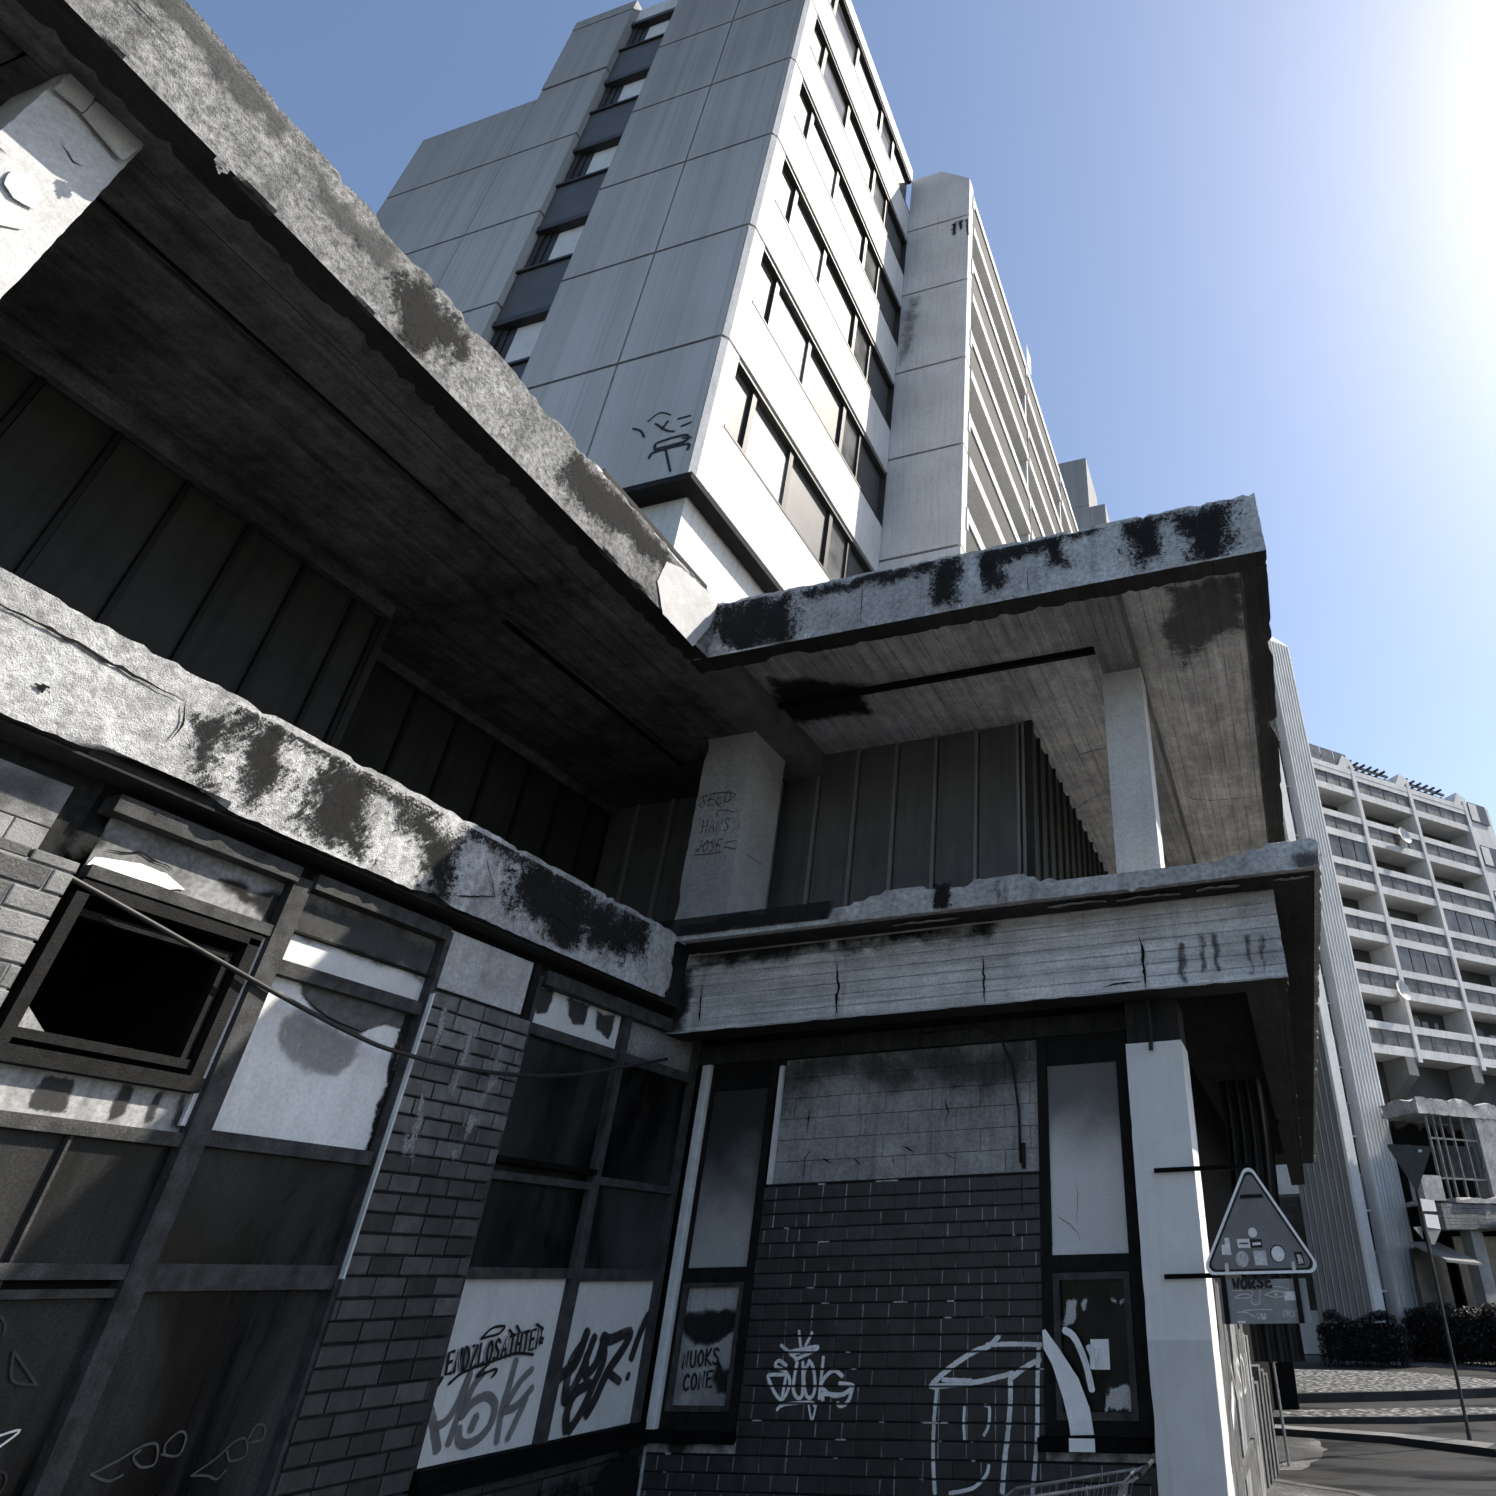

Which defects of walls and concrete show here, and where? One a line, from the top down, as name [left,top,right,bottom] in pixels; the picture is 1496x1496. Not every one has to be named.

damp [154,0,291,138]
peeling [0,171,44,230]
damp [309,162,478,374]
damp [712,499,1249,671]
crack [0,604,186,740]
damp [181,702,833,967]
damp [930,880,953,909]
damp [536,987,615,1039]
damp [664,922,998,1033]
damp [1178,934,1221,982]
damp [1245,936,1266,973]